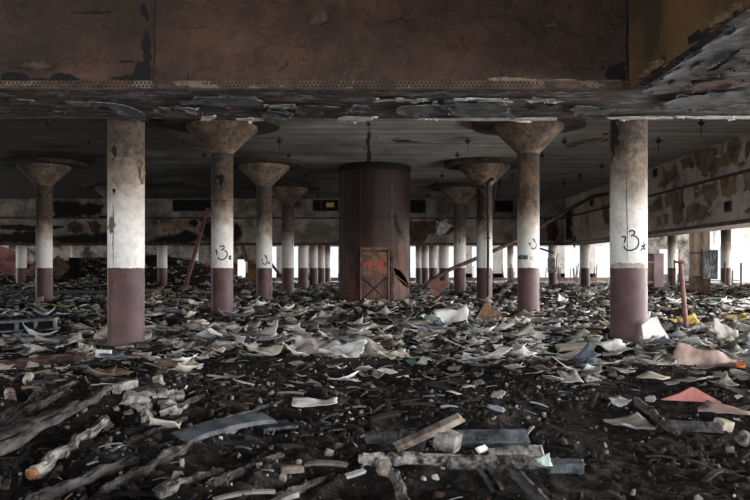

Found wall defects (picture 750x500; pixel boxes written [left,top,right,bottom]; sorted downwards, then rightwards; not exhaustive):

water stain [112,31,152,81]
peeling [338,2,750,124]
peeling [66,100,149,123]
peeling [153,95,296,124]
peeling [648,134,750,228]
peeling [410,219,454,246]